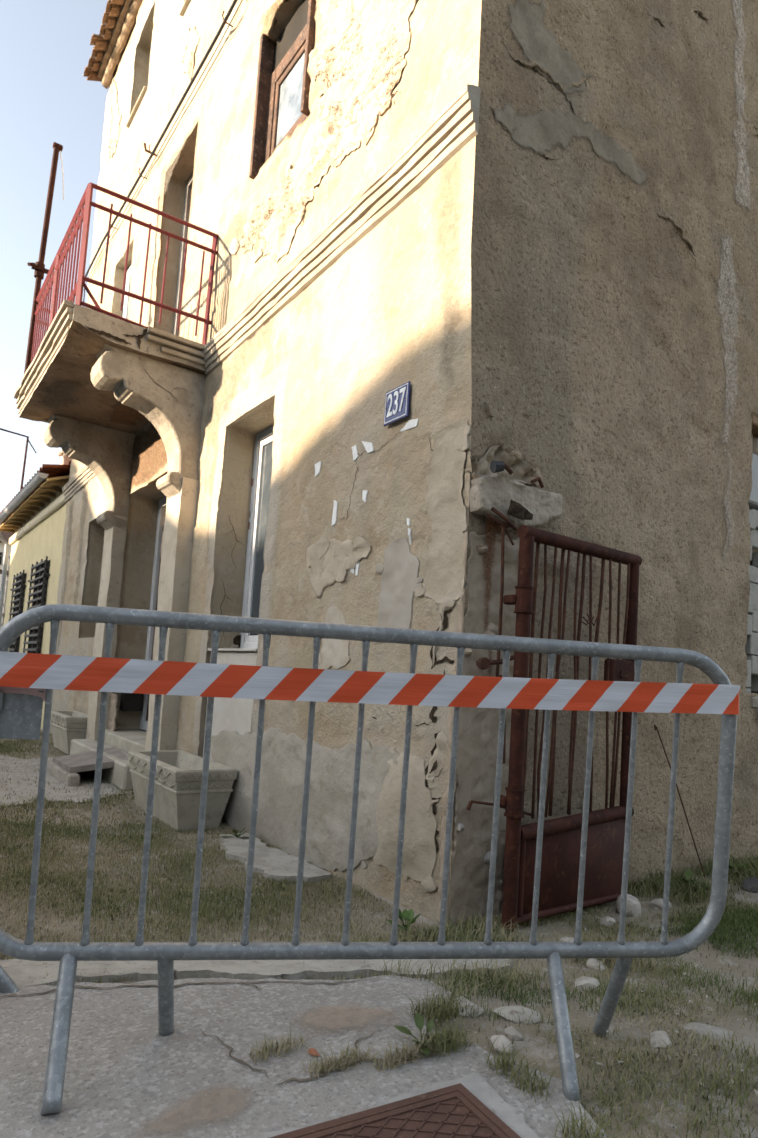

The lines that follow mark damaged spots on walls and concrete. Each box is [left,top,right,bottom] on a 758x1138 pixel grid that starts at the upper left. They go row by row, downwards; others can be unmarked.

spalling [229,0,416,263]
peeling [502,0,591,94]
crack [518,53,591,114]
peeling [490,104,647,184]
water stain [733,0,751,210]
crack [657,207,696,261]
spalling [306,500,384,598]
peeling [414,420,543,635]